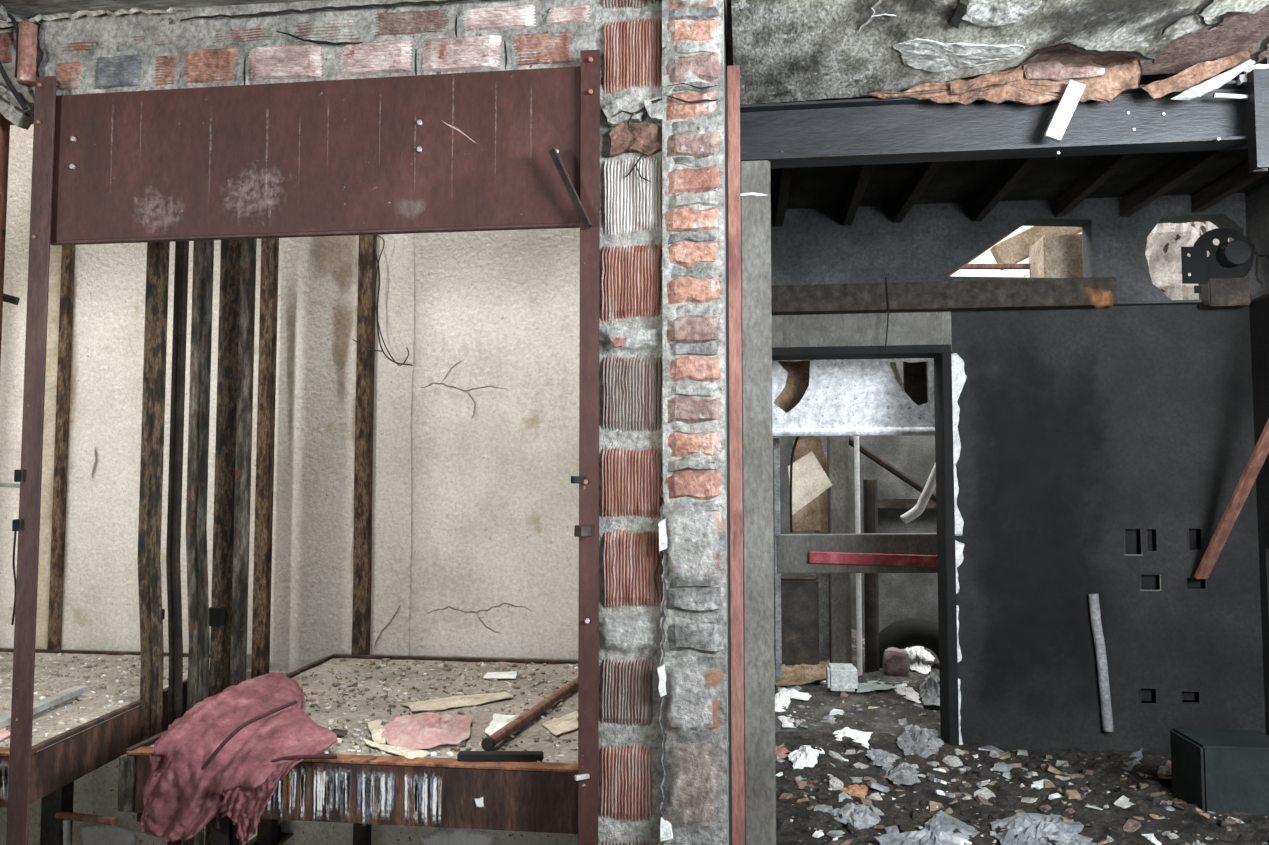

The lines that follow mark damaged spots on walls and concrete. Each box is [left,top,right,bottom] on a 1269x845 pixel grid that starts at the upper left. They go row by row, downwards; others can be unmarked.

crack [240,56,248,85]
crack [0,0,490,77]
crack [501,40,509,70]
spalling [859,0,1269,105]
crack [612,83,719,182]
crack [374,254,531,649]